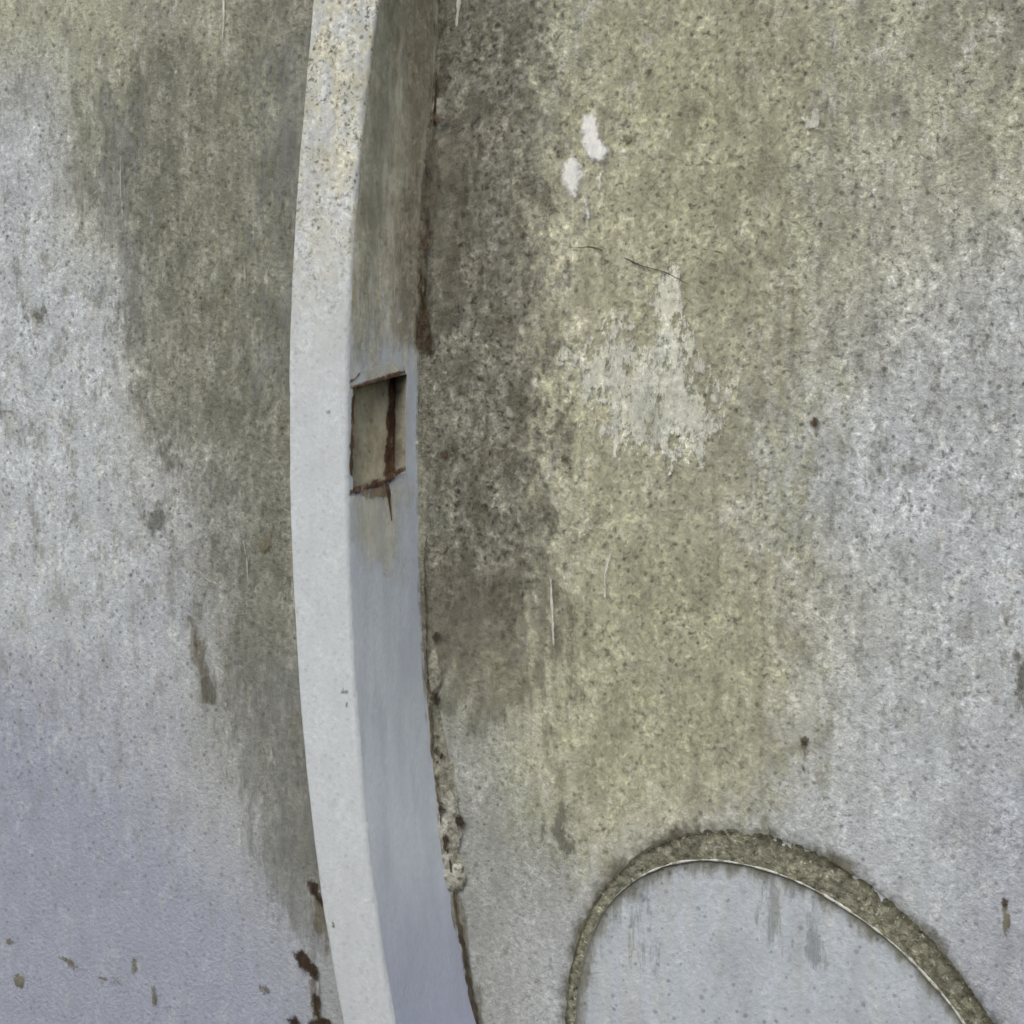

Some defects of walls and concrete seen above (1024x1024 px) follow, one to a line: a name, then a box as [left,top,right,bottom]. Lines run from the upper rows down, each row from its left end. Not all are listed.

peeling [801,108,820,135]
corrosion [415,72,442,354]
spalling [416,0,738,657]
corrosion [349,370,405,521]
corrosion [287,950,331,1024]
corrosion [308,881,329,947]